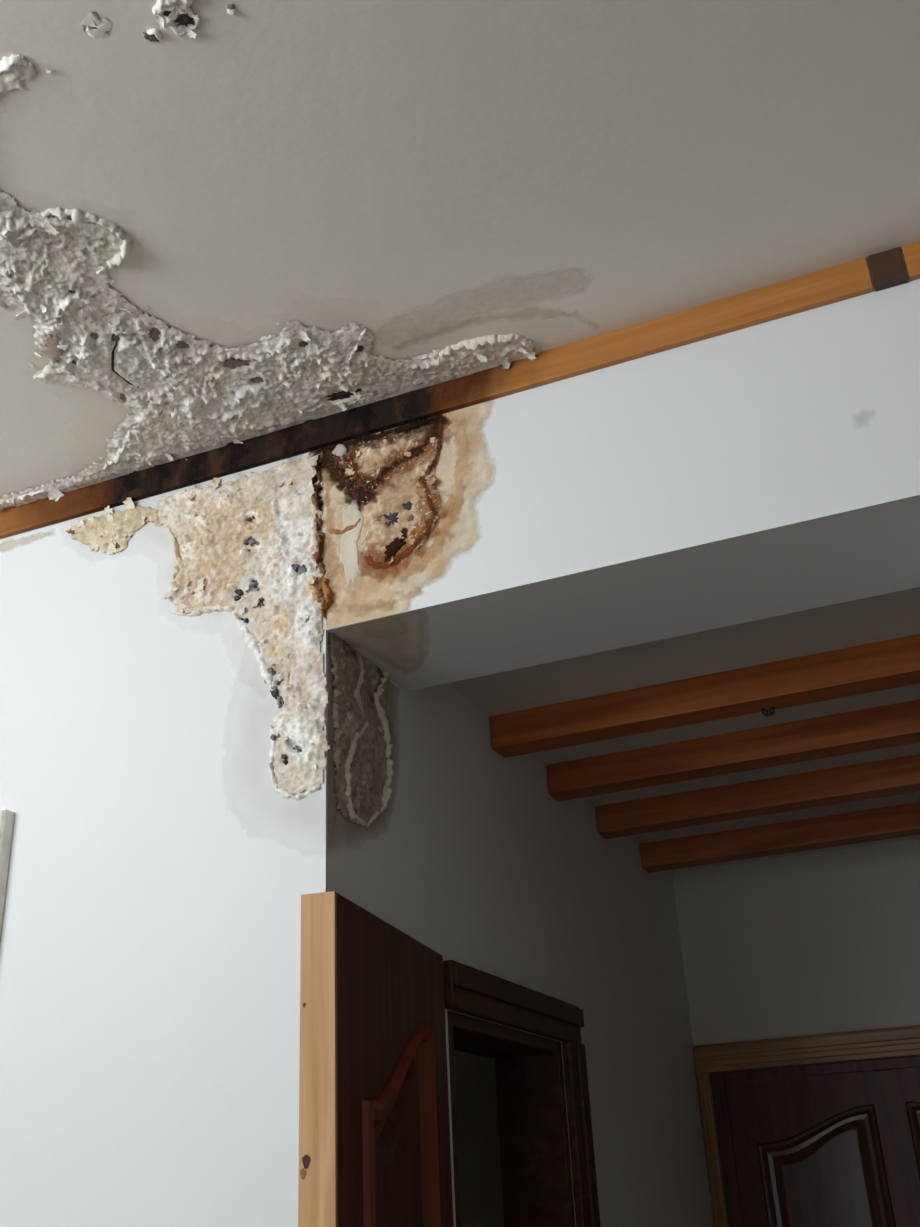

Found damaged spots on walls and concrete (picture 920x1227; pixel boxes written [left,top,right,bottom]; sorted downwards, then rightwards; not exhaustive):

flaking render [0,54,52,93]
peeling [143,0,200,42]
water stain [0,367,495,550]
flaking render [65,414,450,828]
flaking render [0,189,540,511]
rust [321,400,491,629]